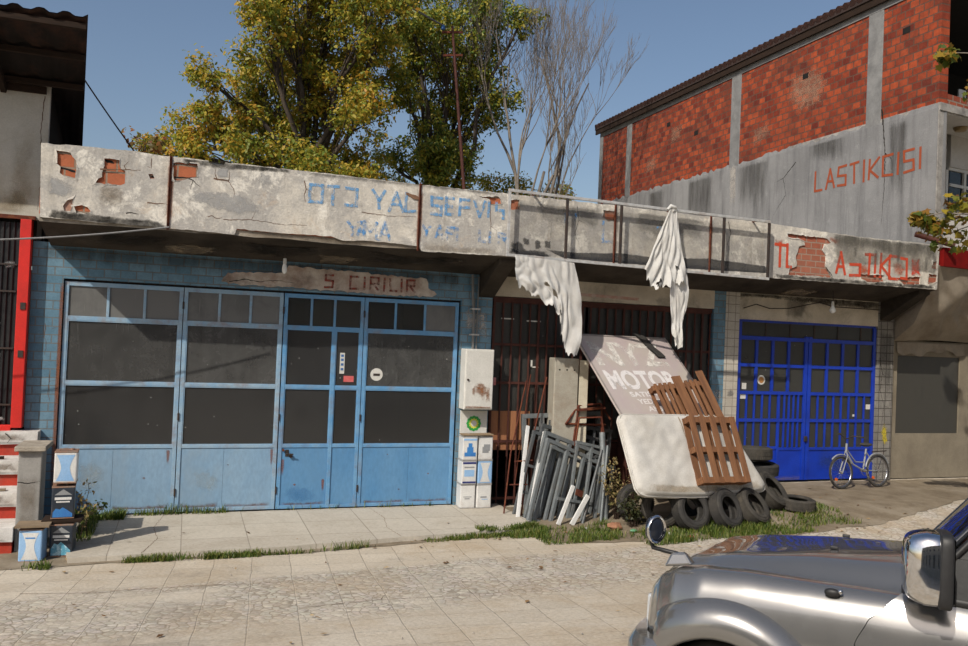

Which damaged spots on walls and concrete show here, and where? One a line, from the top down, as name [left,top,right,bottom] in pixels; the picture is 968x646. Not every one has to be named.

spalling [54,149,79,181]
spalling [93,155,125,188]
spalling [171,162,202,182]
crack [188,169,235,195]
crack [881,109,891,221]
spalling [63,195,92,214]
crack [208,211,307,226]
water stain [639,214,666,234]
water stain [678,219,697,234]
spalling [785,232,832,279]